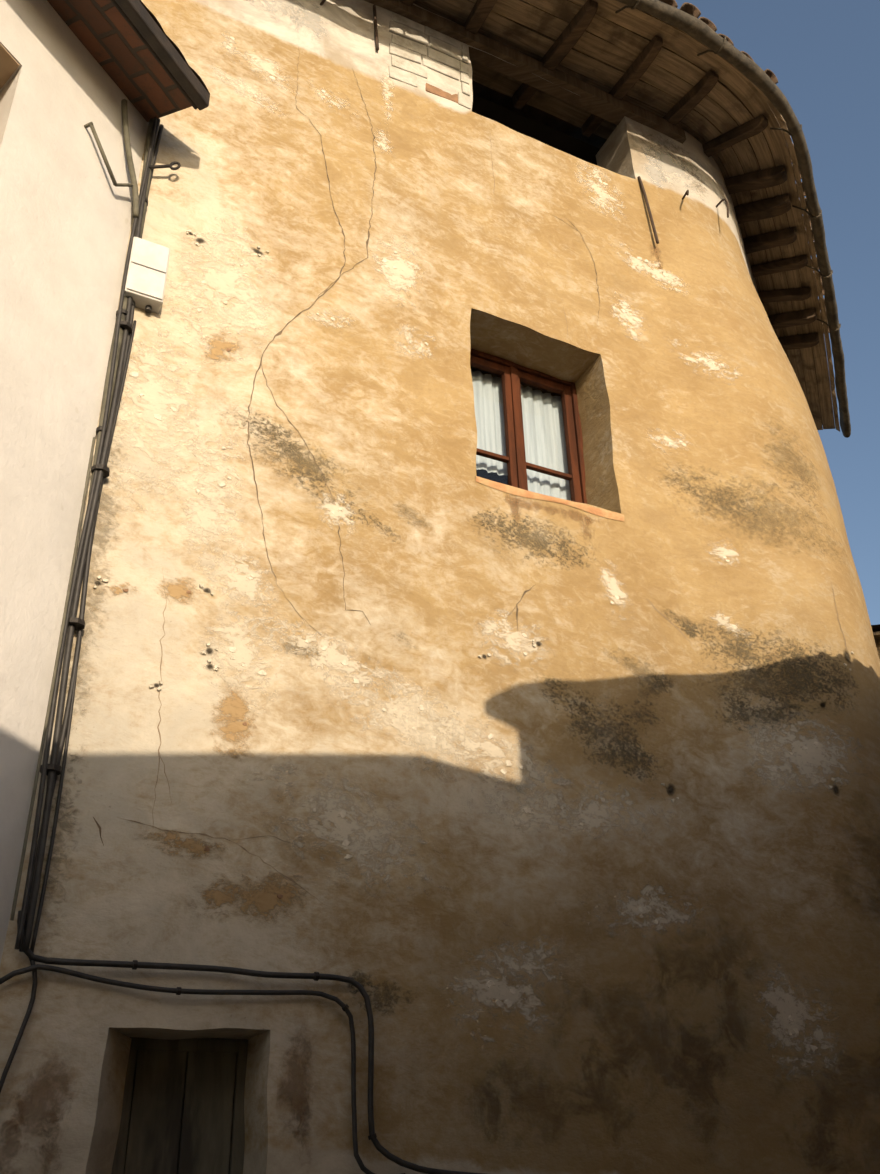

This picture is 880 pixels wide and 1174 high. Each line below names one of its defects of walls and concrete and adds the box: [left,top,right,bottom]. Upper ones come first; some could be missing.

crack [247,57,377,629]
mould [243,419,392,535]
damp [483,514,582,564]
mould [665,612,855,727]
crack [93,571,327,906]
mould [546,679,657,778]